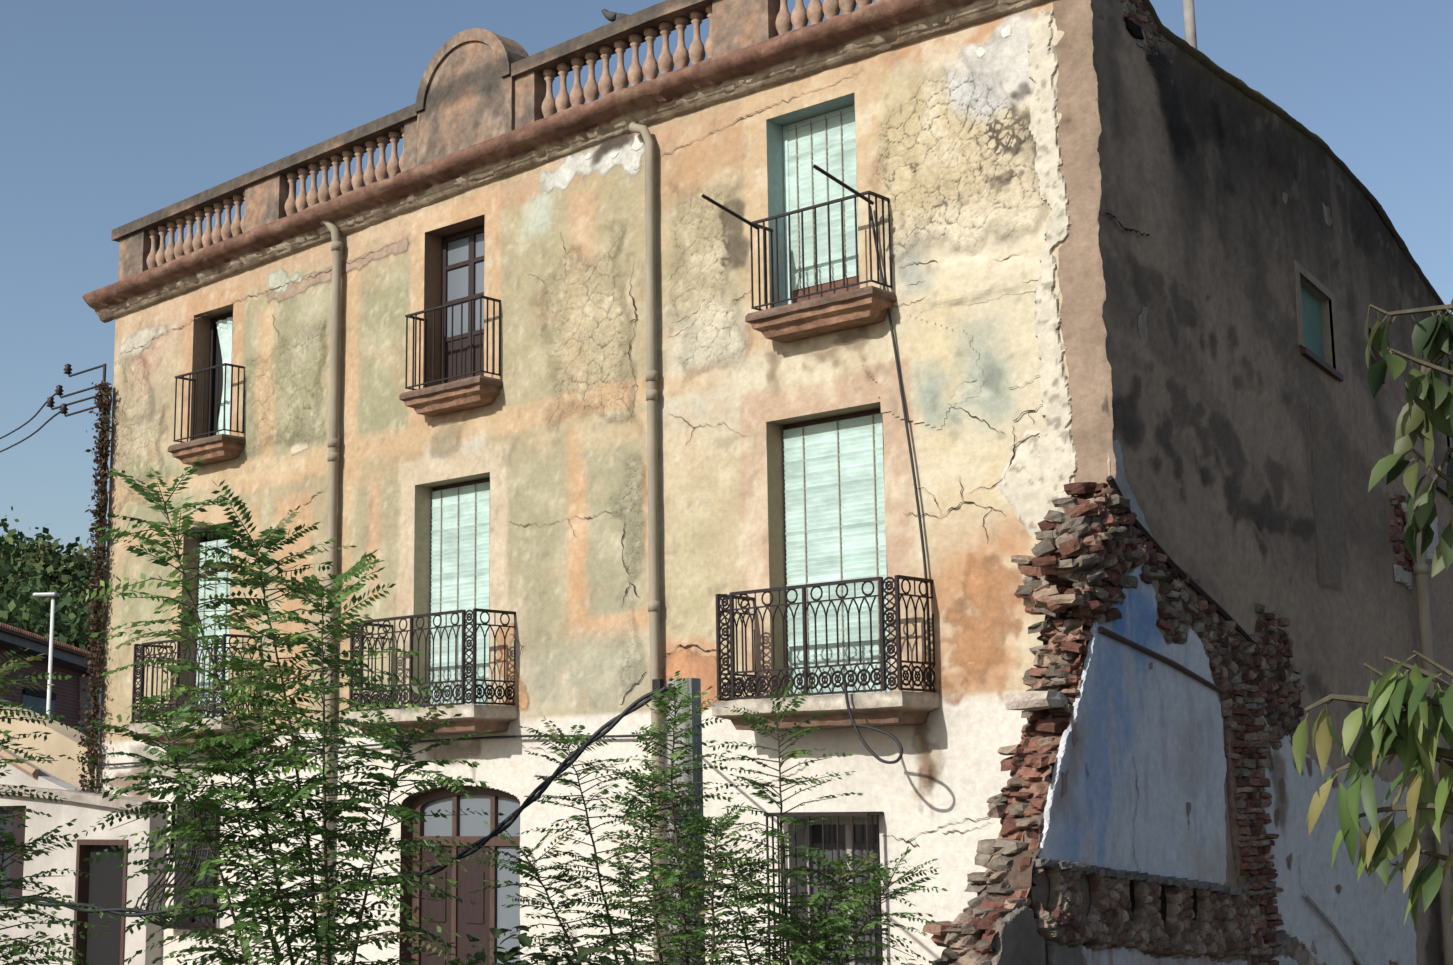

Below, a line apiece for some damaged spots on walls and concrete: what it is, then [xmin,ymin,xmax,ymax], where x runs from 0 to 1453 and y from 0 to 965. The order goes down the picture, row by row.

flaking render [539,135,645,193]
crack [872,70,1045,307]
flaking render [960,0,1116,496]
water stain [1150,46,1193,157]
crack [509,186,751,705]
crack [905,375,1043,544]
water stain [1102,375,1183,494]
water stain [1202,457,1315,548]
flaking render [1386,492,1439,589]
flaking render [662,648,720,712]
flaking render [945,557,1094,797]
spalling [922,791,1048,965]